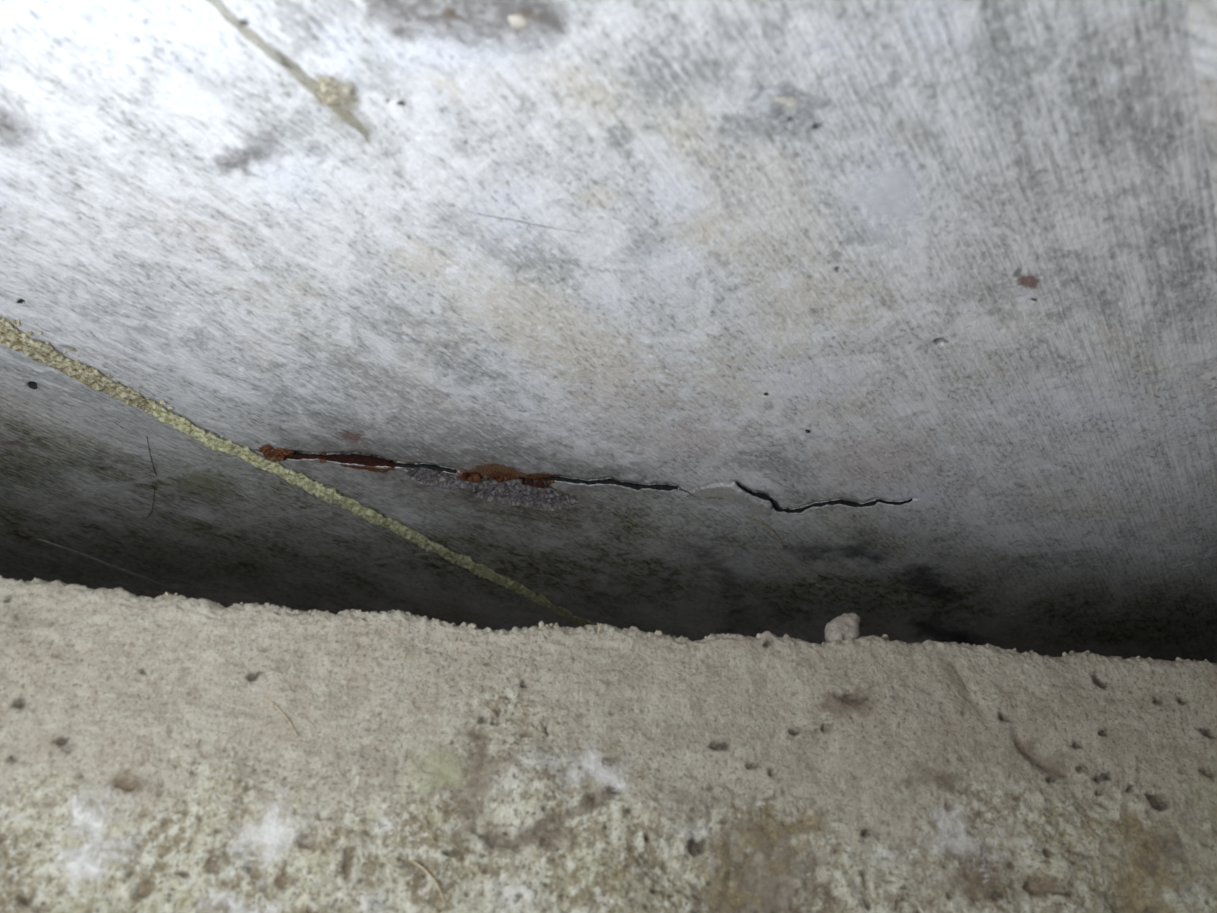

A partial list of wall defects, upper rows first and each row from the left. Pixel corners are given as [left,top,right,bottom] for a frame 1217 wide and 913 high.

rust [256,444,296,461]
crack [286,453,456,473]
rust [457,464,559,488]
crack [543,477,912,513]